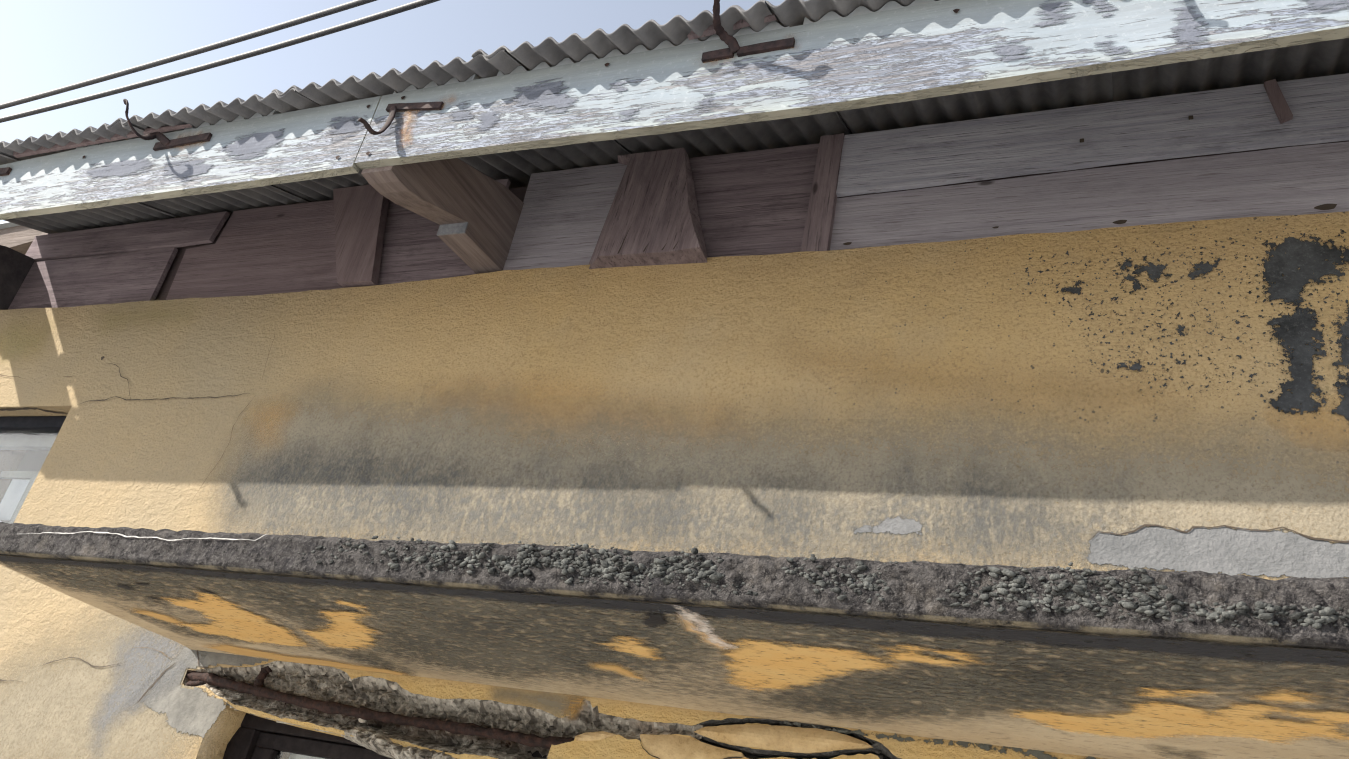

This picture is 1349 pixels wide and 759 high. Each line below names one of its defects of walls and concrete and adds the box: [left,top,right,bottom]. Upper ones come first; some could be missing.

peeling [1020,228,1349,428]
crack [0,334,275,497]
crack [28,531,266,541]
leakage [222,397,1349,571]
peeling [1086,525,1349,579]
spalling [144,647,744,759]
leakage [0,556,1349,759]
crack [693,718,902,759]